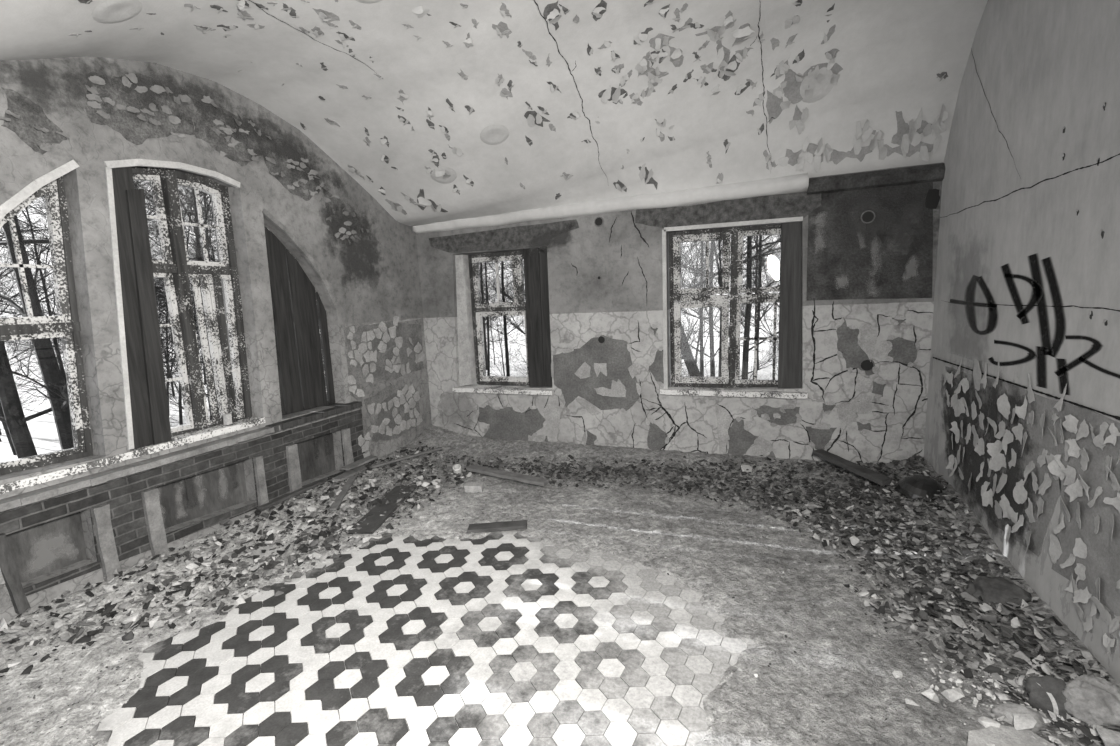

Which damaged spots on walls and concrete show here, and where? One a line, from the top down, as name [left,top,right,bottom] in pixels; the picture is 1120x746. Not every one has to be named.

peeling [0,87,70,155]
damp [18,62,343,191]
peeling [85,71,369,244]
peeling [184,0,361,57]
crack [534,0,607,177]
peeling [587,0,948,173]
crack [940,49,1120,218]
damp [324,207,379,282]
flaking render [0,316,425,596]
crack [454,395,585,437]
crack [609,211,745,454]
peeling [943,359,1120,654]